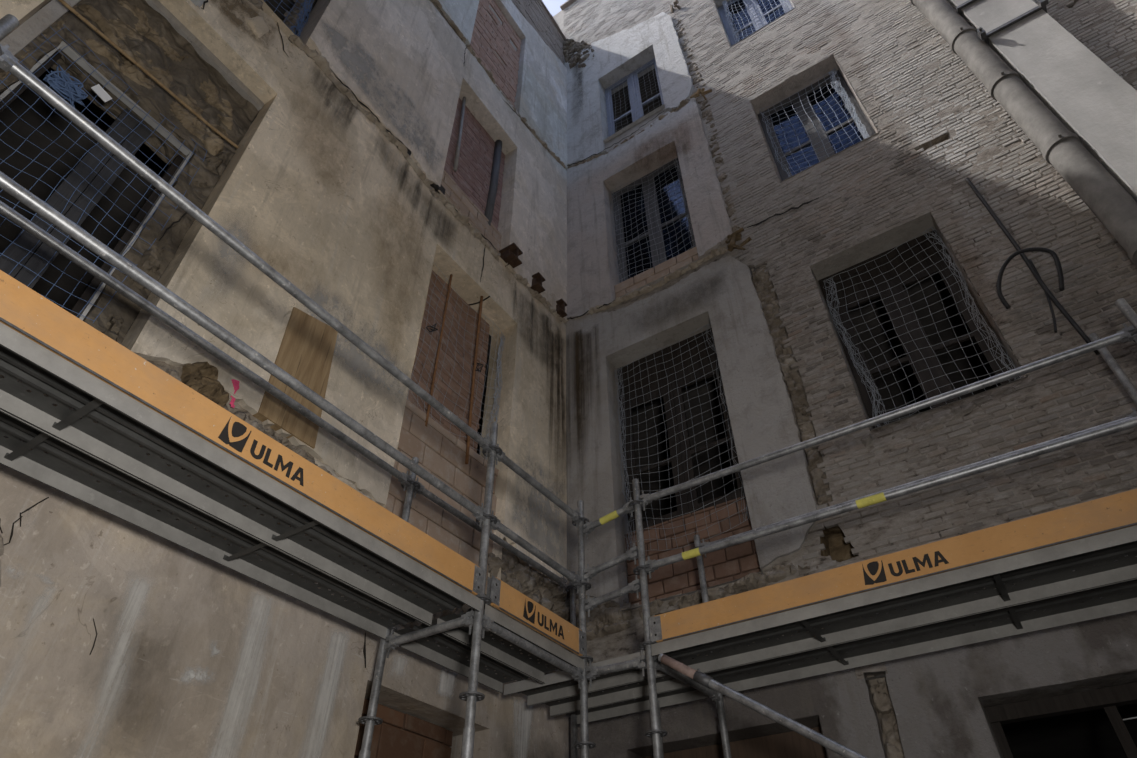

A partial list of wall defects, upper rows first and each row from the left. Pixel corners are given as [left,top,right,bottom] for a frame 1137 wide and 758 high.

crack [315,49,411,153]
flaking render [431,0,741,233]
spalling [751,265,833,507]
crack [0,497,49,545]
water stain [98,580,148,720]
water stain [211,595,270,758]
water stain [303,633,346,758]
spalling [867,676,905,758]